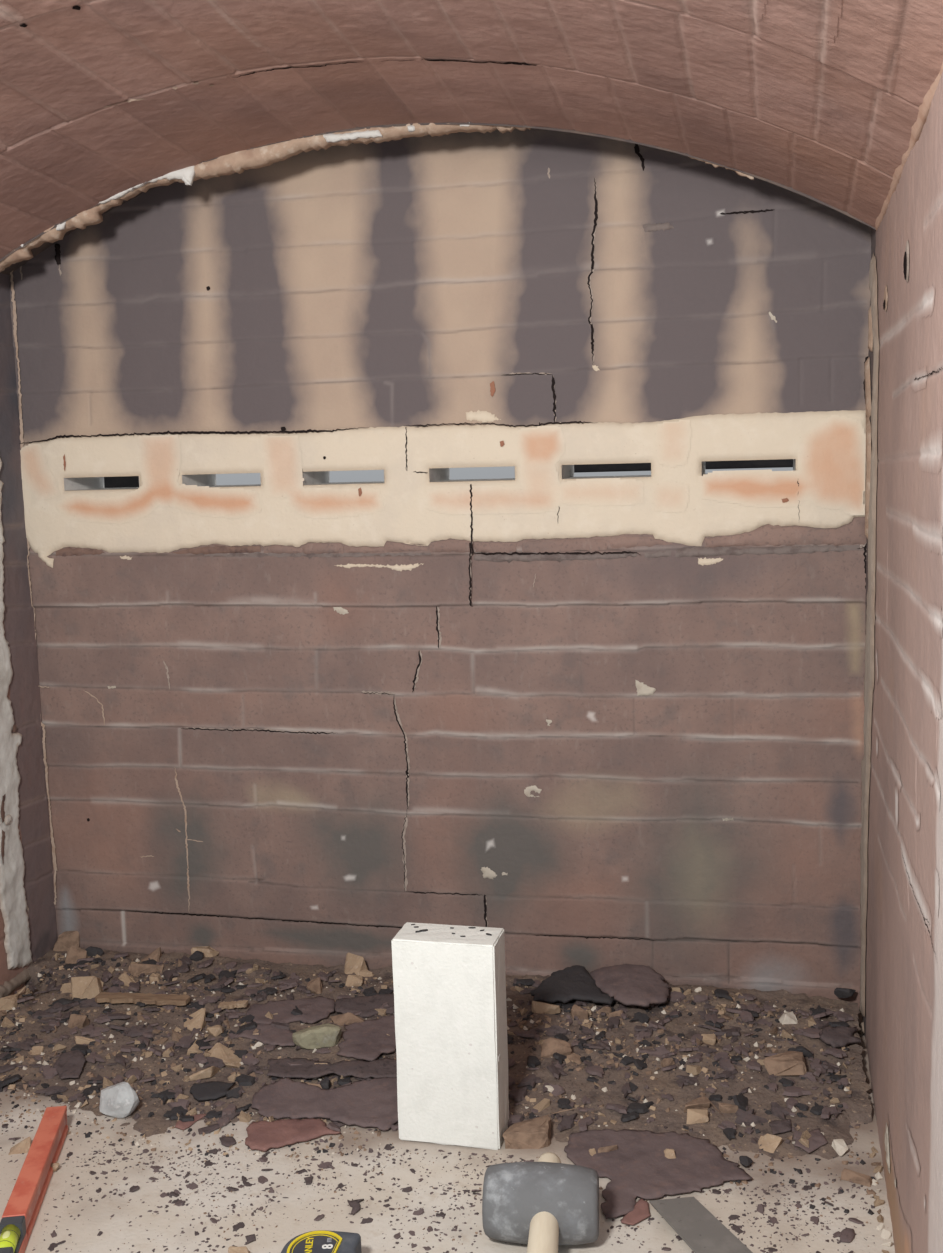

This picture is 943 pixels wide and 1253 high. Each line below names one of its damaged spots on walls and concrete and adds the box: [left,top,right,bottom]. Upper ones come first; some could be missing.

crack [173,59,573,90]
crack [587,178,598,362]
corrosion [20,435,385,525]
corrosion [426,425,644,515]
corrosion [655,420,692,467]
corrosion [698,415,866,516]
crack [467,484,475,606]
crack [362,606,442,890]